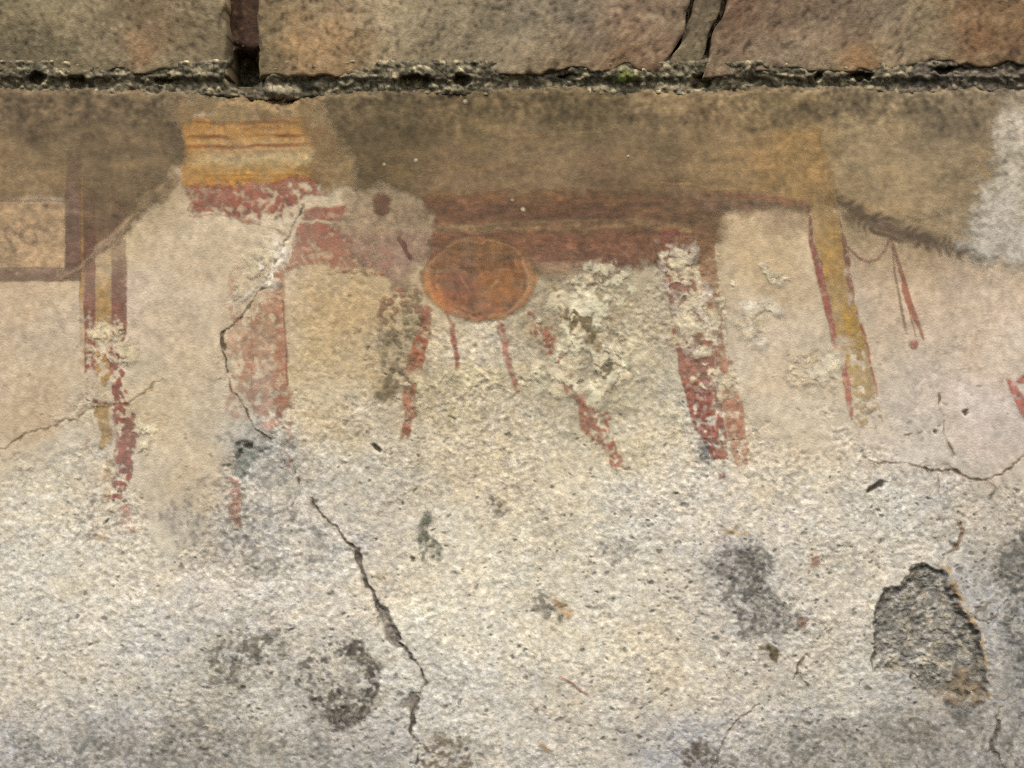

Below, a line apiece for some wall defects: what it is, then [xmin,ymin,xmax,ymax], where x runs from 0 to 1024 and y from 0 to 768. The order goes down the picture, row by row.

crack [220,286,424,764]
water stain [336,641,377,685]
spalling [871,564,986,705]